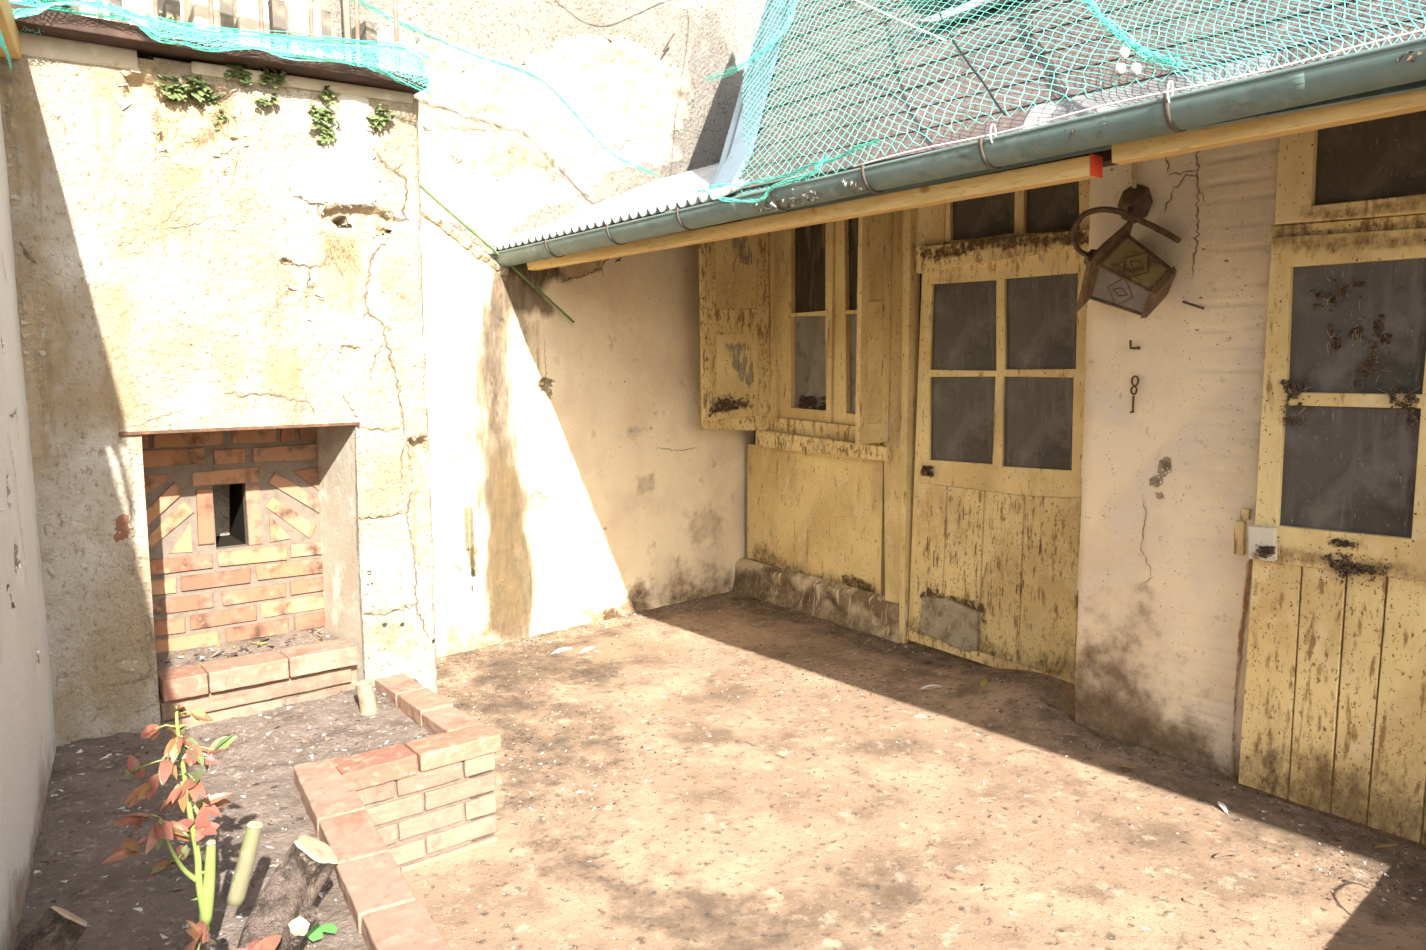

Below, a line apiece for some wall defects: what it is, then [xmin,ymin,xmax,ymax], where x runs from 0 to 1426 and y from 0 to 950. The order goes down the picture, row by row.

crack [1164,151,1206,276]
crack [226,142,472,643]
leakage [436,263,594,709]
leakage [572,589,648,635]
leakage [670,578,782,614]
crack [1140,499,1153,583]
peeling [1149,456,1173,500]
leakage [1040,646,1258,803]